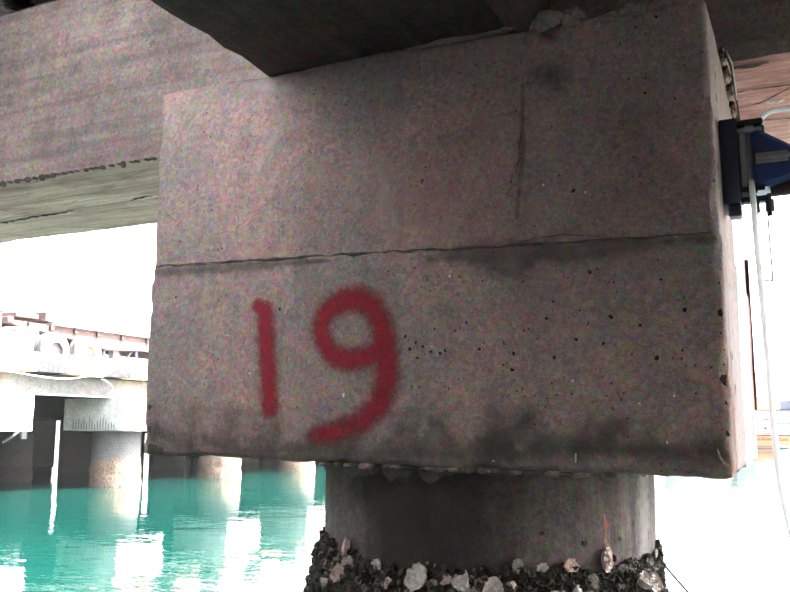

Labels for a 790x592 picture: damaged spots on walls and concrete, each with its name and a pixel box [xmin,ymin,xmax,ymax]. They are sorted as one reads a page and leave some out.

crack [2,0,51,11]
crack [153,232,710,267]